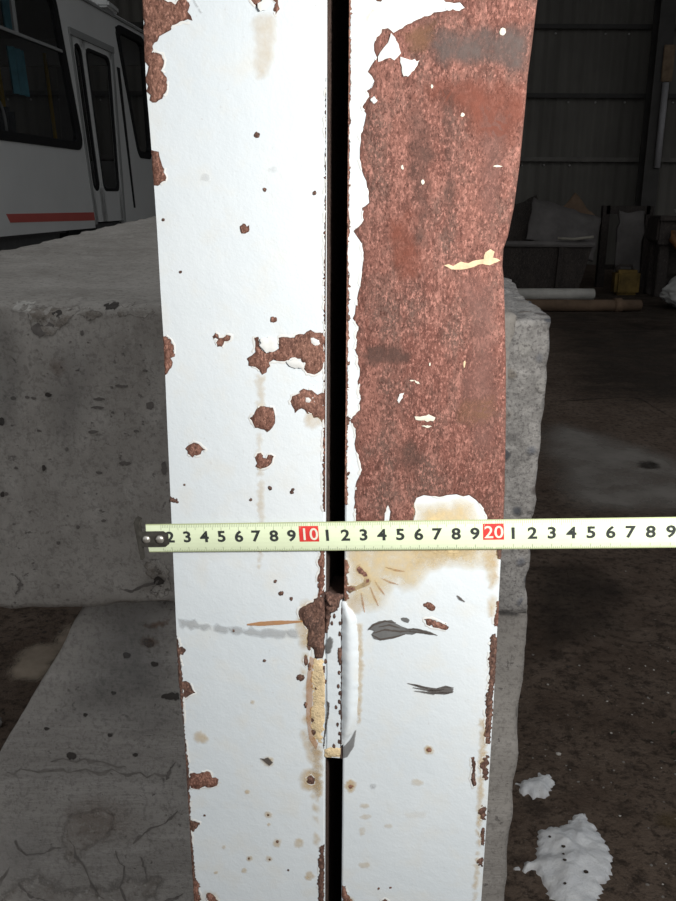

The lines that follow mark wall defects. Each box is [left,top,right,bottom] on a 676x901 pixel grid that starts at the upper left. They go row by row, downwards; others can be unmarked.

peeling [248,0,271,11]
rust [248,404,276,432]
rust [424,506,469,520]
rust [247,551,356,758]
rust [468,601,499,789]
crack [7,758,176,780]
rust [176,635,221,901]
rust [478,805,487,845]
crack [0,811,178,901]